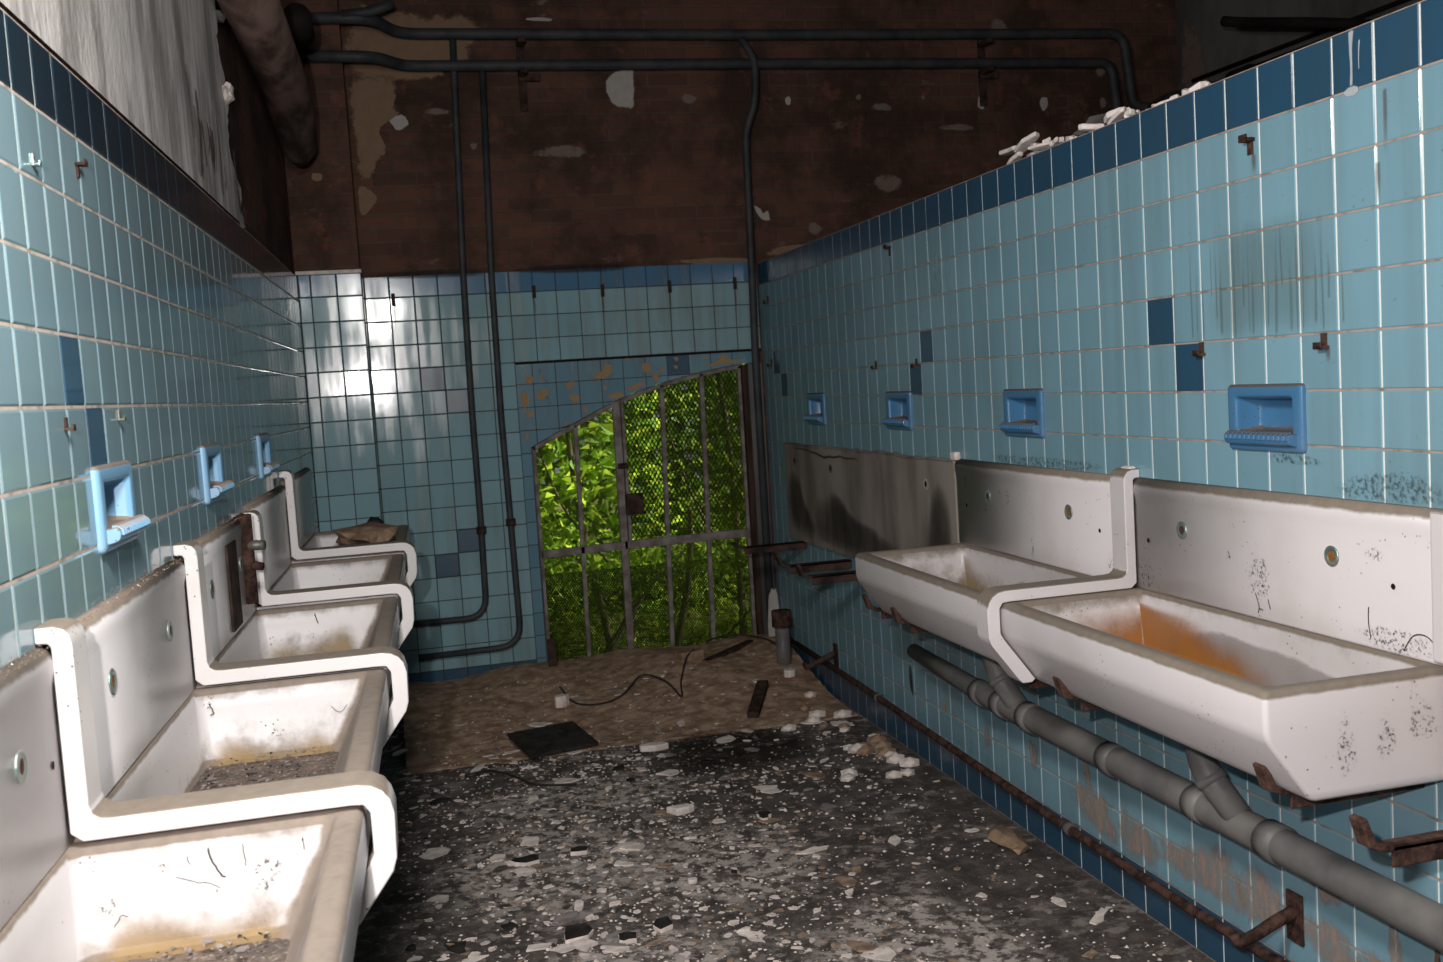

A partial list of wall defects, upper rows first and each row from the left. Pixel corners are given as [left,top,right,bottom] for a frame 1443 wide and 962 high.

flaking render [342,4,481,180]
peeling [520,372,549,440]
peeling [593,357,678,398]
damp [932,501,947,546]